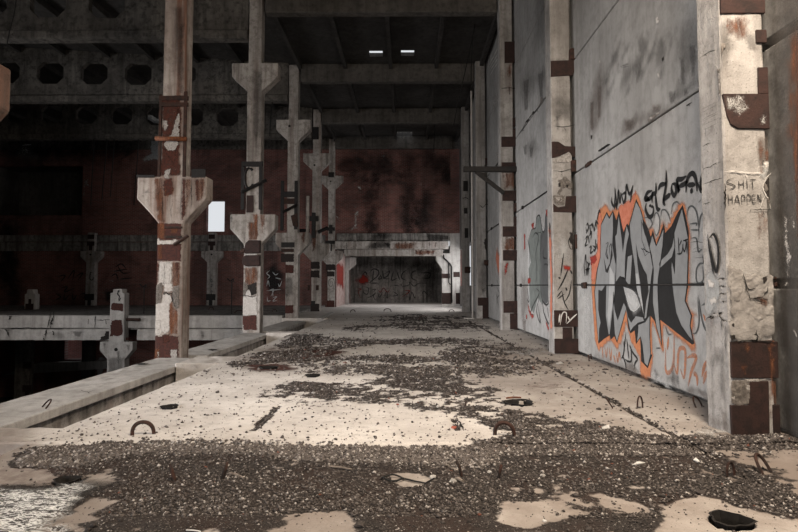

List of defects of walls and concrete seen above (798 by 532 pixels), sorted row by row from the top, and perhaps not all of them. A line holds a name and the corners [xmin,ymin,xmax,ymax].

spalling [163,114,180,151]
rust [154,100,204,286]
peeling [155,261,180,335]
peeling [243,282,257,316]